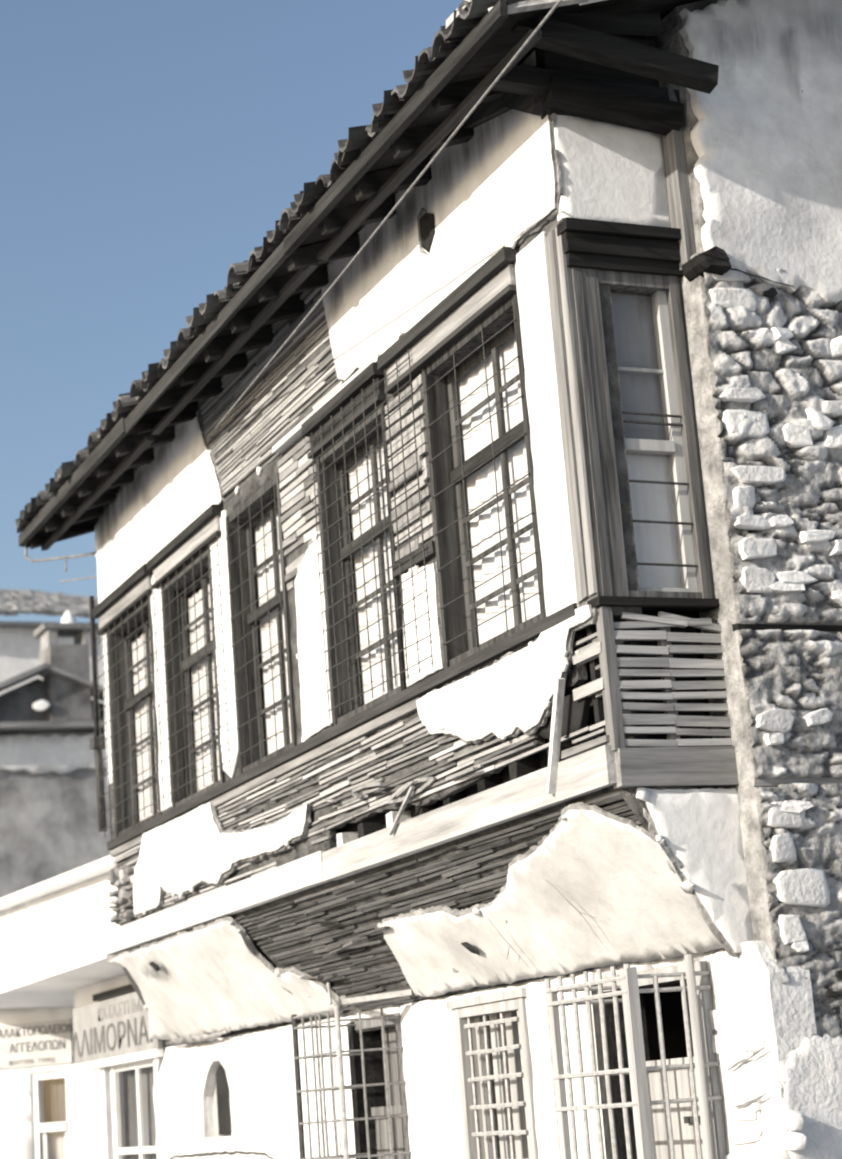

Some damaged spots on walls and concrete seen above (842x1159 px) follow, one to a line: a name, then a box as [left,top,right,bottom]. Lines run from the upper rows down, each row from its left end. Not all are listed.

spalling [764,288,778,299]
flaking render [113,373,732,928]
flaking render [234,786,754,1017]
flaking render [145,961,164,976]
spalling [825,970,842,998]